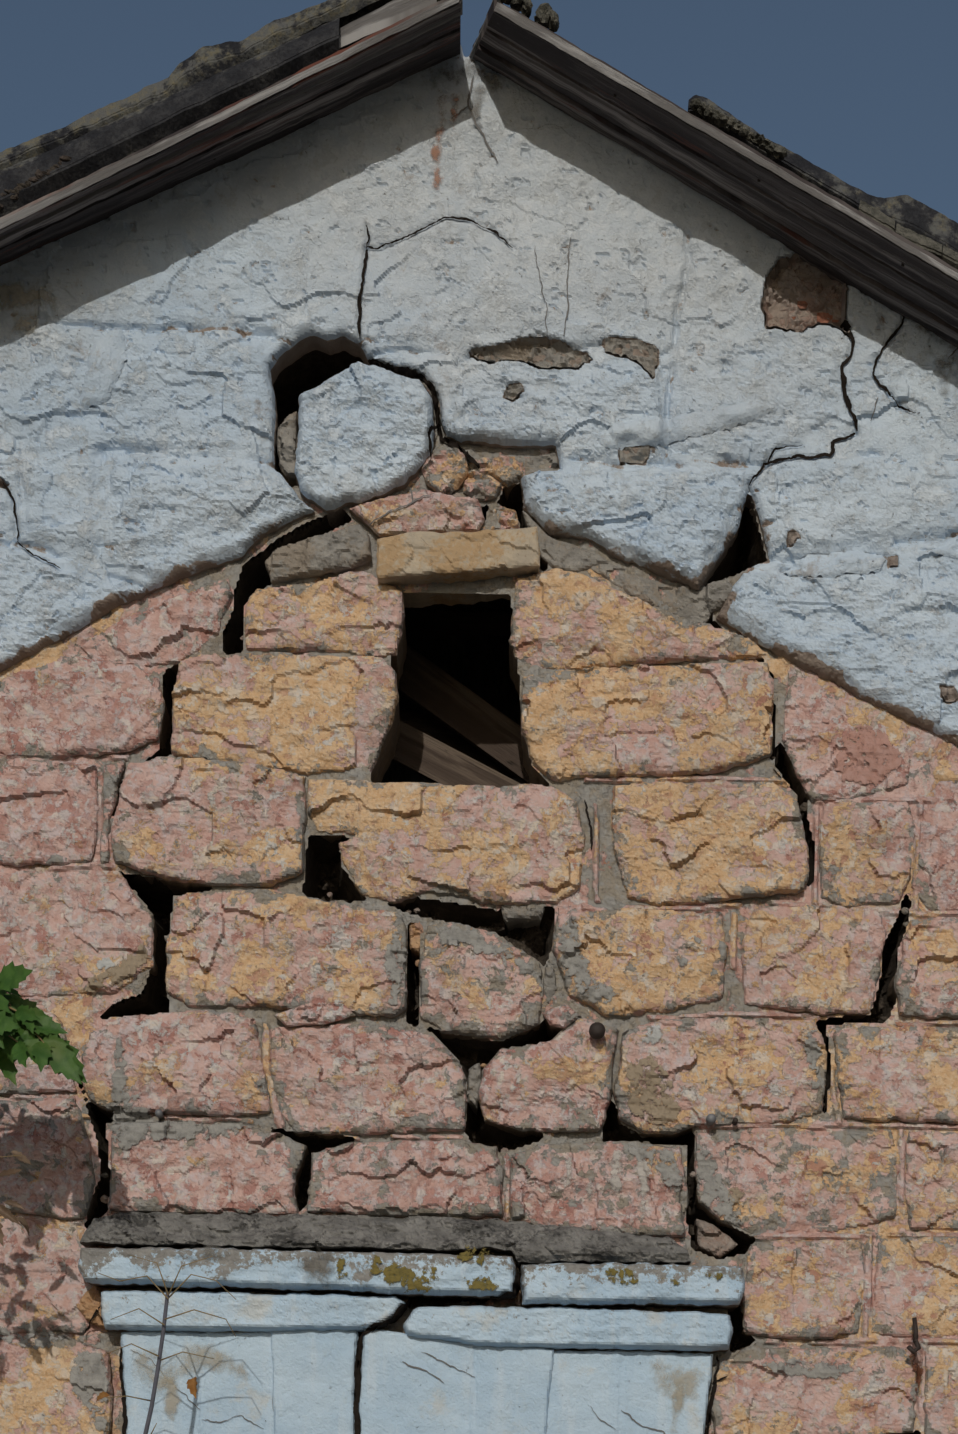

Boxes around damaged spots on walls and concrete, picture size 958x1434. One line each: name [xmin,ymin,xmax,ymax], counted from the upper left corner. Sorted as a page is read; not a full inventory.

crack [357,216,571,469]
spalling [505,384,523,400]
spalling [471,337,657,377]
spalling [763,254,850,336]
crack [705,316,916,628]
crack [223,488,434,655]
crack [101,873,182,1019]
crack [303,836,559,1152]
crack [816,894,913,1113]
crack [78,1083,113,1228]
crack [602,1095,755,1259]
crack [353,1268,521,1434]